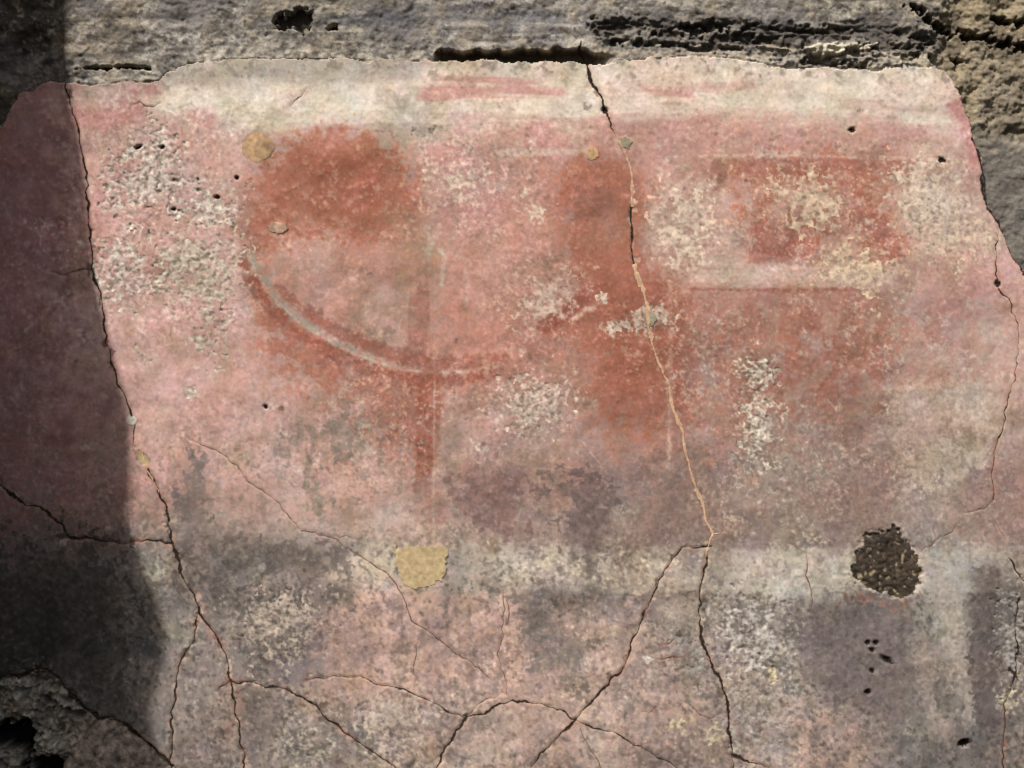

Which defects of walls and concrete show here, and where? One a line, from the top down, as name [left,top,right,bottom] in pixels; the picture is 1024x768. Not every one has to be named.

crack [577,41,616,136]
crack [0,82,770,768]
crack [922,102,1024,550]
flaking render [851,525,923,599]
crack [1001,532,1024,768]